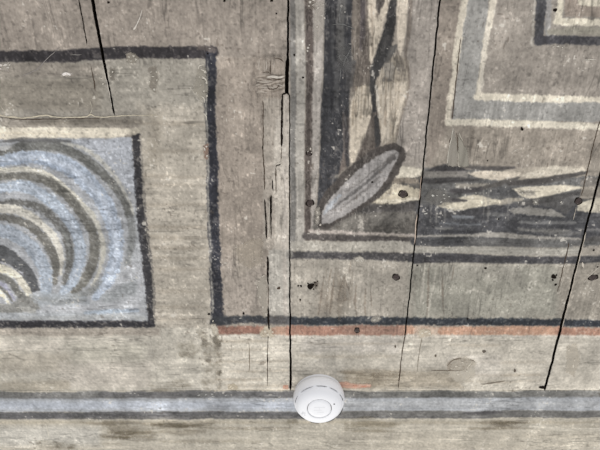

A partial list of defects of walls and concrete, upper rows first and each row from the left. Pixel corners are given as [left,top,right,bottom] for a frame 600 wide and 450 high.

crack [0,0,147,120]
crack [262,0,292,388]
crack [398,0,441,387]
crack [539,122,600,389]